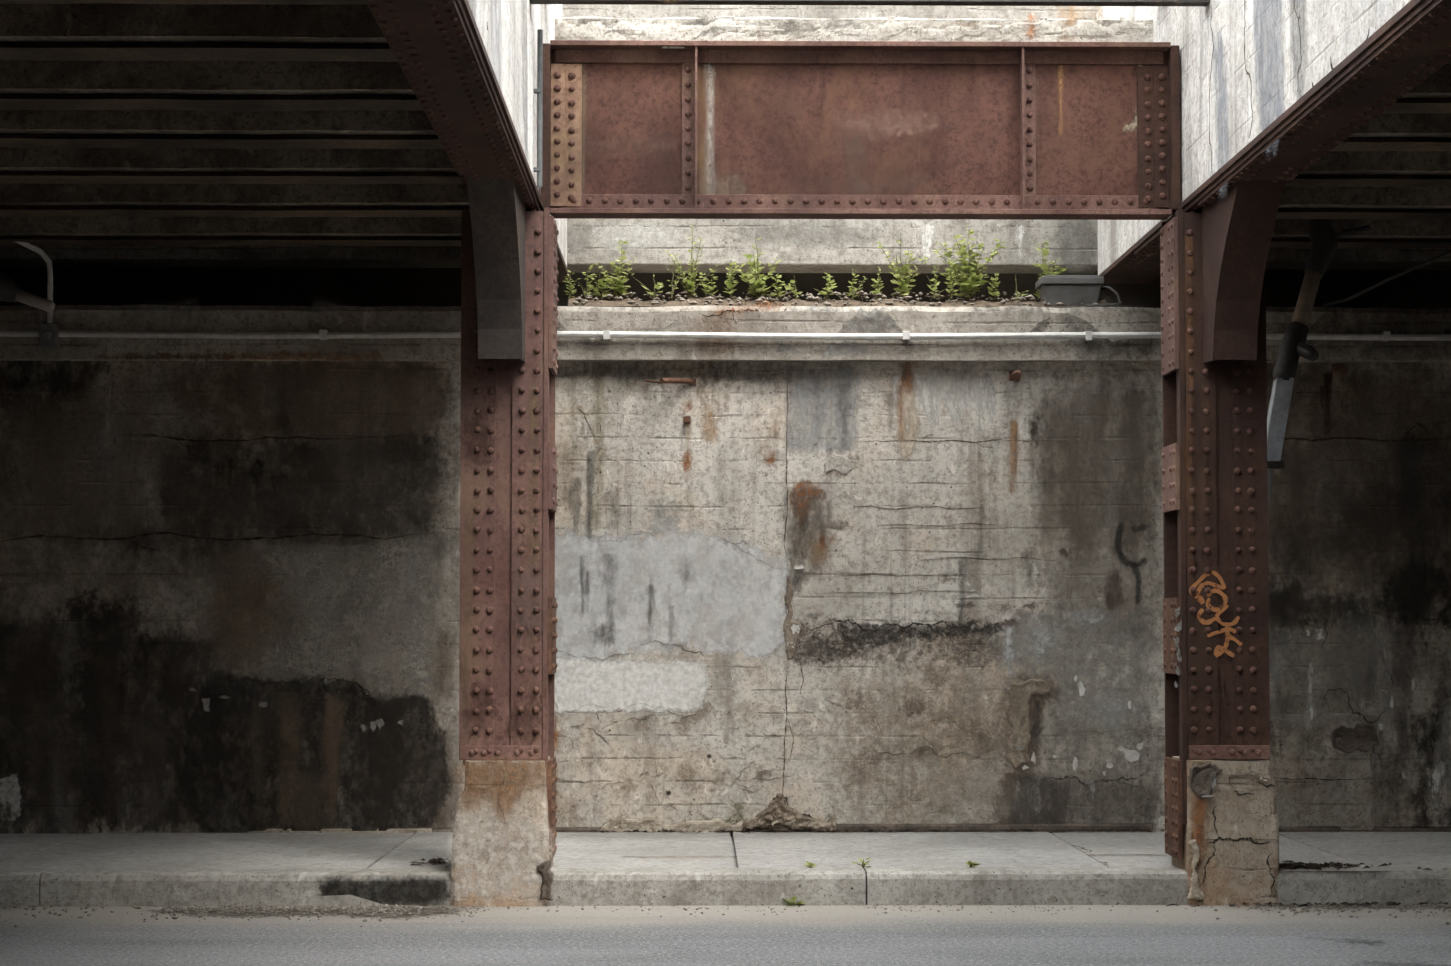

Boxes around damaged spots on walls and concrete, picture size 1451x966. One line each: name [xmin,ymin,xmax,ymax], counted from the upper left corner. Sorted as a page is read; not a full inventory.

corrosion [790,481,825,525]
water stain [555,456,788,661]
crack [554,309,1150,824]
water stain [1268,563,1451,641]
water stain [0,593,452,834]
spalling [1188,762,1270,798]
water stain [1412,693,1451,828]
water stain [320,814,555,906]
spalling [1187,839,1204,900]